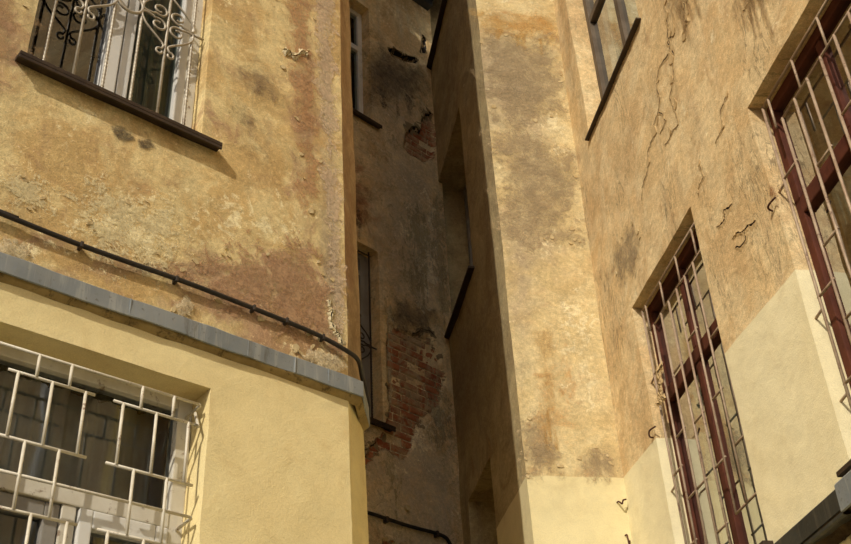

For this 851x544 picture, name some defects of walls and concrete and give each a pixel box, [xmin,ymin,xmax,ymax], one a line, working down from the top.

flaking render [403,107,436,162]
crack [641,0,690,205]
crack [715,91,728,143]
crack [697,159,705,194]
crack [716,202,756,252]
crack [326,299,346,345]
flaking render [365,305,445,470]
crack [365,437,378,459]